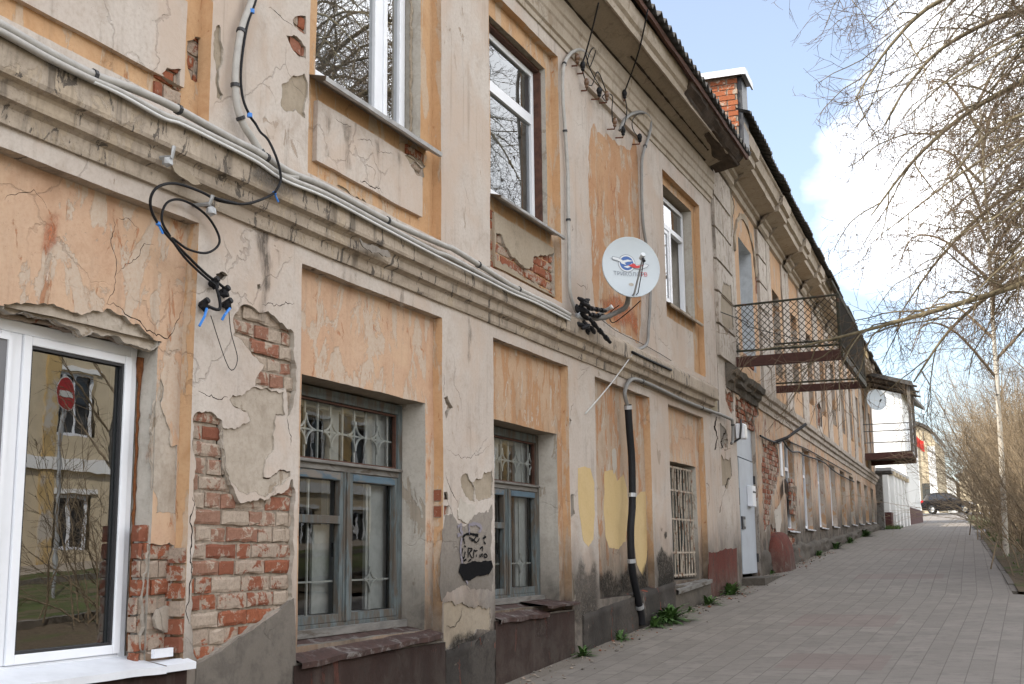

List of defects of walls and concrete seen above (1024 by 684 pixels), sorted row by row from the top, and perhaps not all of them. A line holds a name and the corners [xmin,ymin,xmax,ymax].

flaking render [153,37,200,104]
spalling [281,73,308,118]
crack [107,218,183,339]
flaking render [490,210,555,298]
spalling [0,302,161,352]
flaking render [127,304,297,661]
spalling [434,471,493,523]
flaking render [718,389,797,545]
water stain [575,530,674,622]
spalling [443,601,491,649]